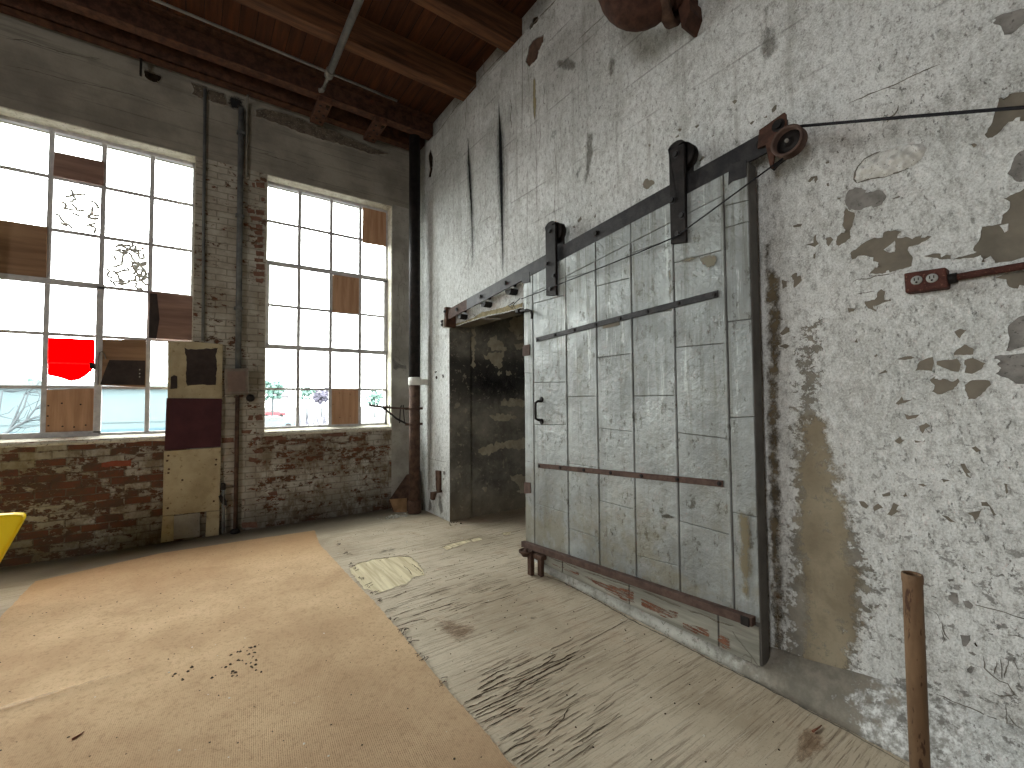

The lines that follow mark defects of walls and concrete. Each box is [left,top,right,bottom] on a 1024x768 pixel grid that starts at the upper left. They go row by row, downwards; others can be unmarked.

spalling [525,14,546,68]
crack [432,0,557,220]
peeling [969,90,1024,150]
peeling [802,148,1024,314]
peeling [780,271,804,291]
peeling [872,314,1024,401]
flaking render [221,414,287,463]
water stain [766,244,784,649]
water stain [793,416,866,669]
peeling [778,315,984,670]
peeling [939,500,999,524]
peeling [958,631,996,676]